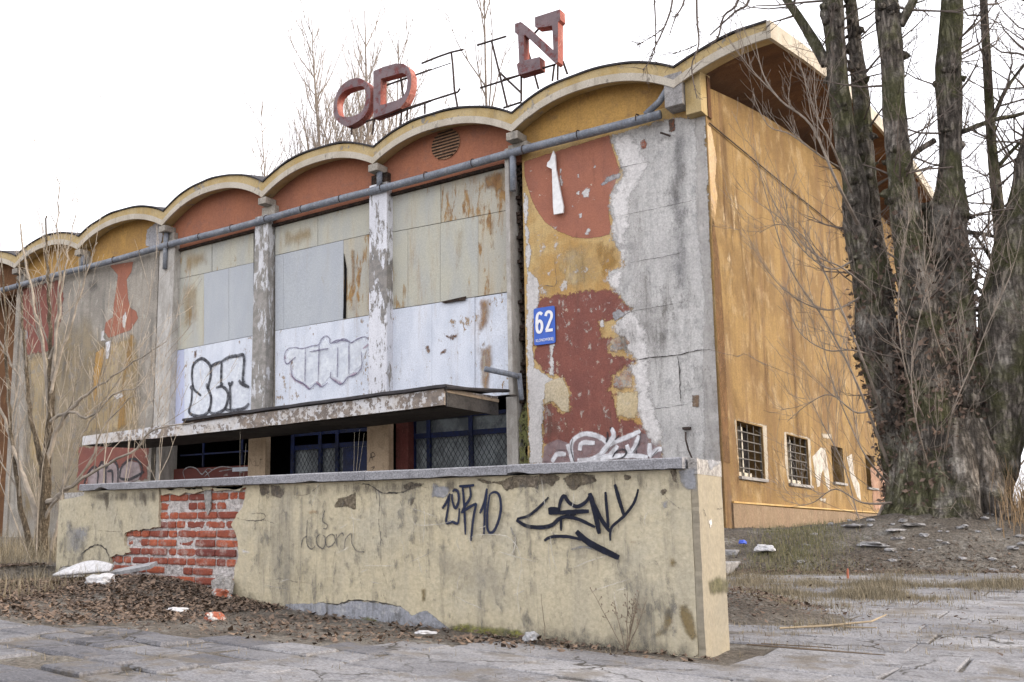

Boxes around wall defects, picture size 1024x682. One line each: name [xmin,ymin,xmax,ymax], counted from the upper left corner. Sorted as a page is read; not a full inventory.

corrosion [485,173,503,191]
peeling [572,116,720,507]
peeling [478,193,596,491]
peeling [182,411,261,425]
spalling [335,493,356,509]
flaking render [112,485,246,587]
spalling [285,601,449,629]